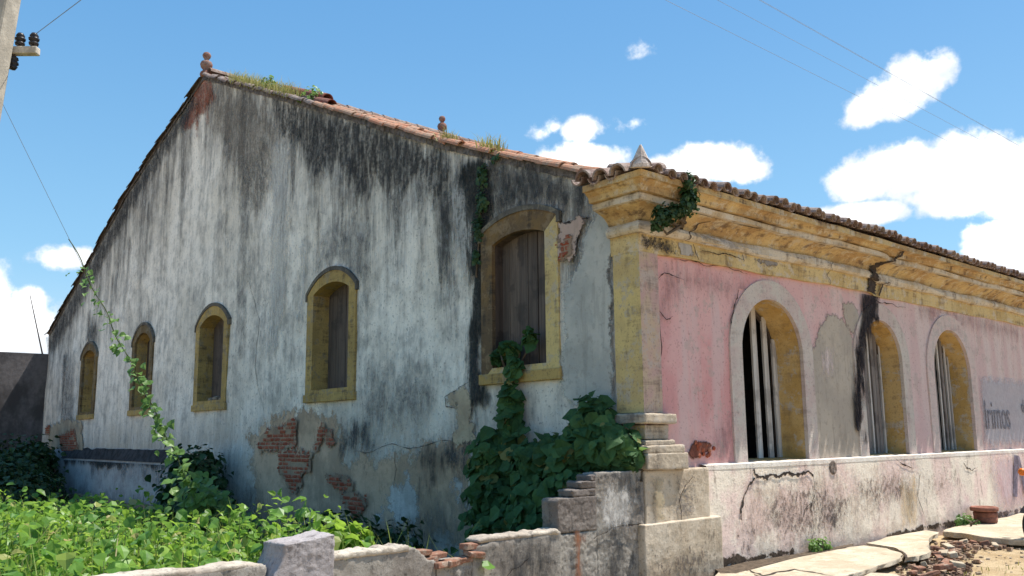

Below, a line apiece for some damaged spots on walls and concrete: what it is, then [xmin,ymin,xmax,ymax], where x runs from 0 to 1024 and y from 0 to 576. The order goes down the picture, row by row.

corrosion [185,79,216,130]
damp [214,86,583,419]
flaking render [555,215,589,262]
crack [867,251,904,307]
flaking render [813,302,860,458]
damp [853,294,880,441]
flaking render [45,418,83,451]
flaking render [245,382,486,569]
flaking render [688,440,716,459]
crack [740,469,823,538]